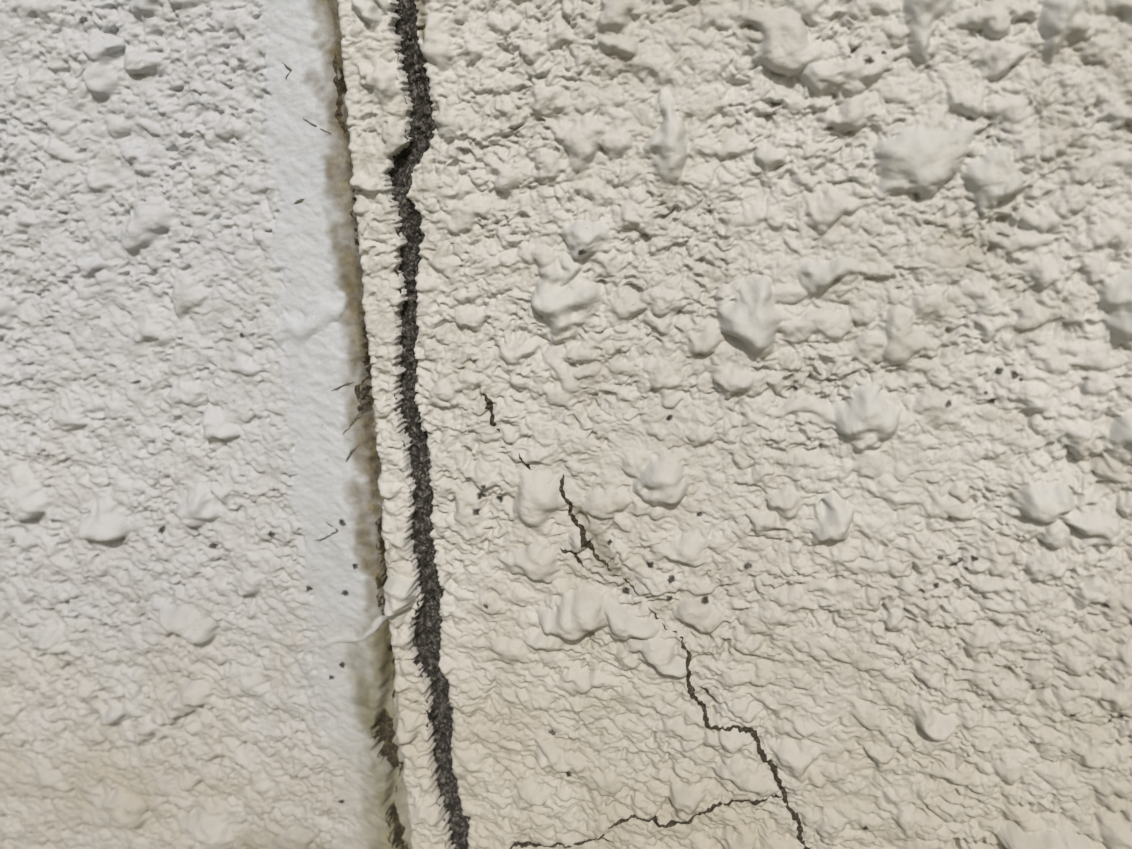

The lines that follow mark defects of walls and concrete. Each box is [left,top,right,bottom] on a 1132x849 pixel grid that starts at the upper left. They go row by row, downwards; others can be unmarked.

crack [303,54,348,134]
crack [331,0,470,849]
crack [480,392,500,432]
crack [314,522,338,541]
crack [510,474,810,849]